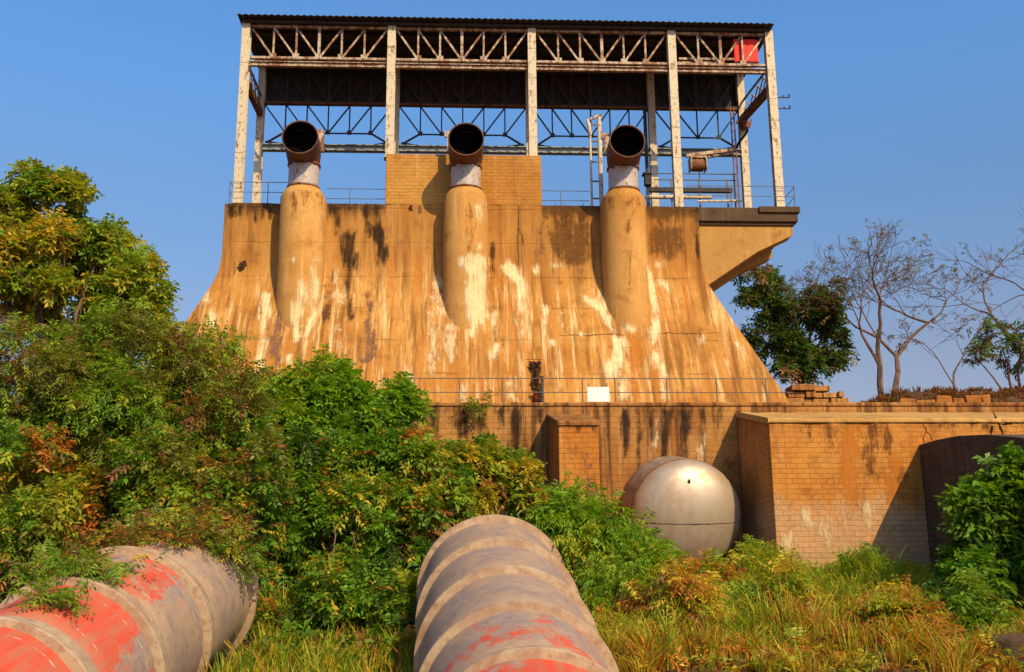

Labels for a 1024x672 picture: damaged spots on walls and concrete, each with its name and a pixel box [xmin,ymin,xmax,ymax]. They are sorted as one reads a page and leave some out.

water stain [256,204,389,368]
water stain [453,381,486,437]
water stain [424,205,590,373]
water stain [498,376,521,451]
water stain [584,208,706,462]
water stain [863,423,892,480]